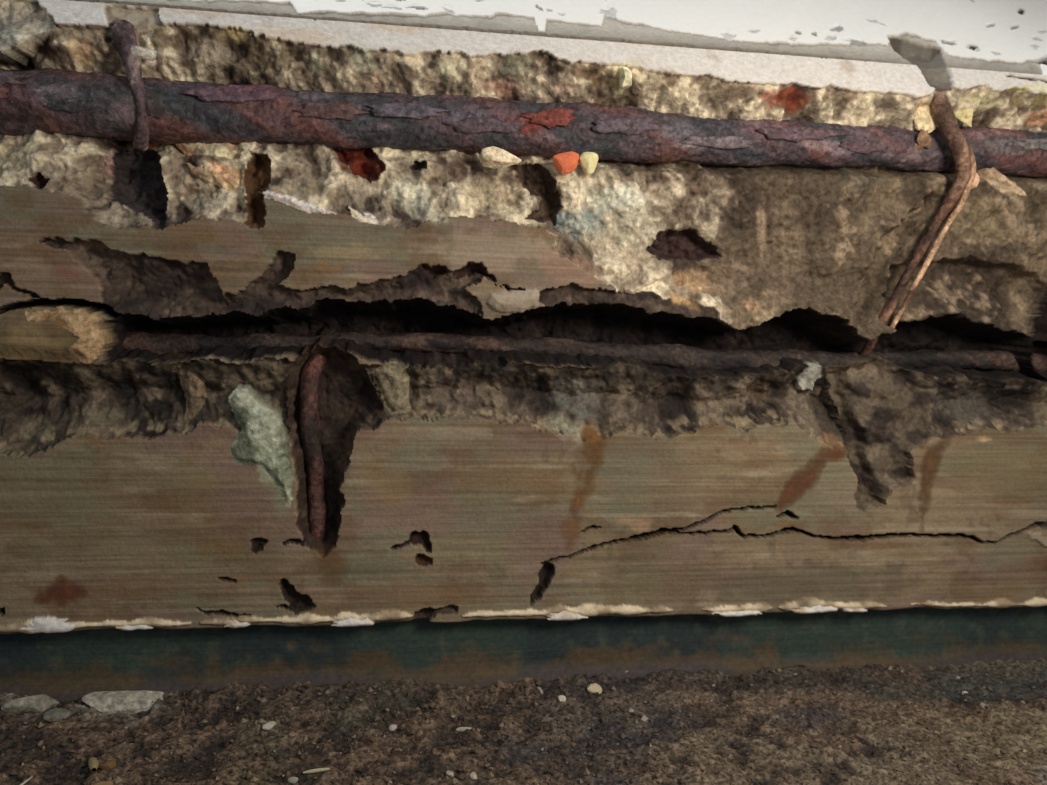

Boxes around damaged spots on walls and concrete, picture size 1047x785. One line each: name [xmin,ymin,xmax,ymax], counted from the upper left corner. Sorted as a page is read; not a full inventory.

spalling [0,0,127,77]
flaking render [68,0,1047,75]
corrosion [364,102,452,120]
corrosion [520,108,577,130]
spalling [135,22,1047,133]
corrosion [591,116,665,135]
corrosion [675,127,896,154]
corrosion [776,88,808,111]
corrosion [1007,139,1047,151]
crack [0,273,126,320]
spalling [0,130,1047,458]
crack [541,505,1038,565]